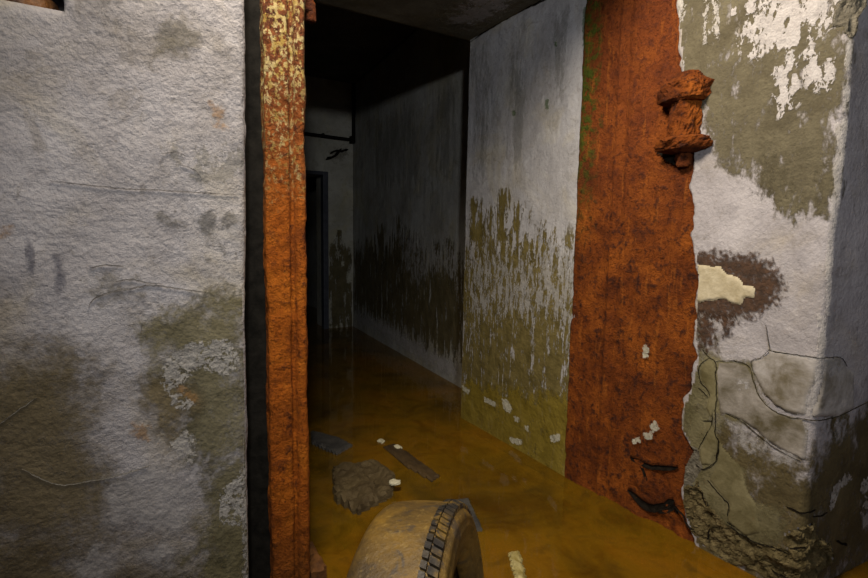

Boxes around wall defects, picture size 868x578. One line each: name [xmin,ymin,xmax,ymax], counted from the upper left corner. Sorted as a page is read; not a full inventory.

peeling [702,0,720,45]
peeling [731,0,867,119]
leakage [0,288,248,578]
leakage [329,187,575,477]
flaking render [697,264,755,305]
leakage [682,325,868,578]